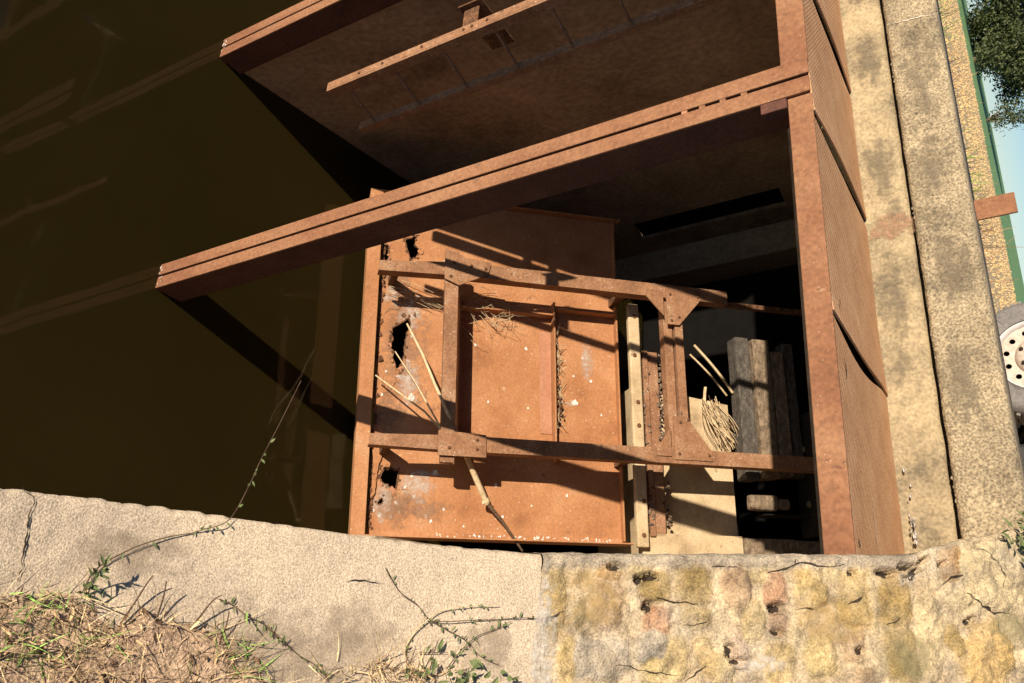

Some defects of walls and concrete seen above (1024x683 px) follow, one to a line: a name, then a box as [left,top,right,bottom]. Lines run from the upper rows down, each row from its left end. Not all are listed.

corrosion [377,305,425,431]
corrosion [556,351,564,427]
corrosion [370,449,436,523]
crack [17,488,35,581]
crack [768,560,843,573]
crack [943,575,1007,614]